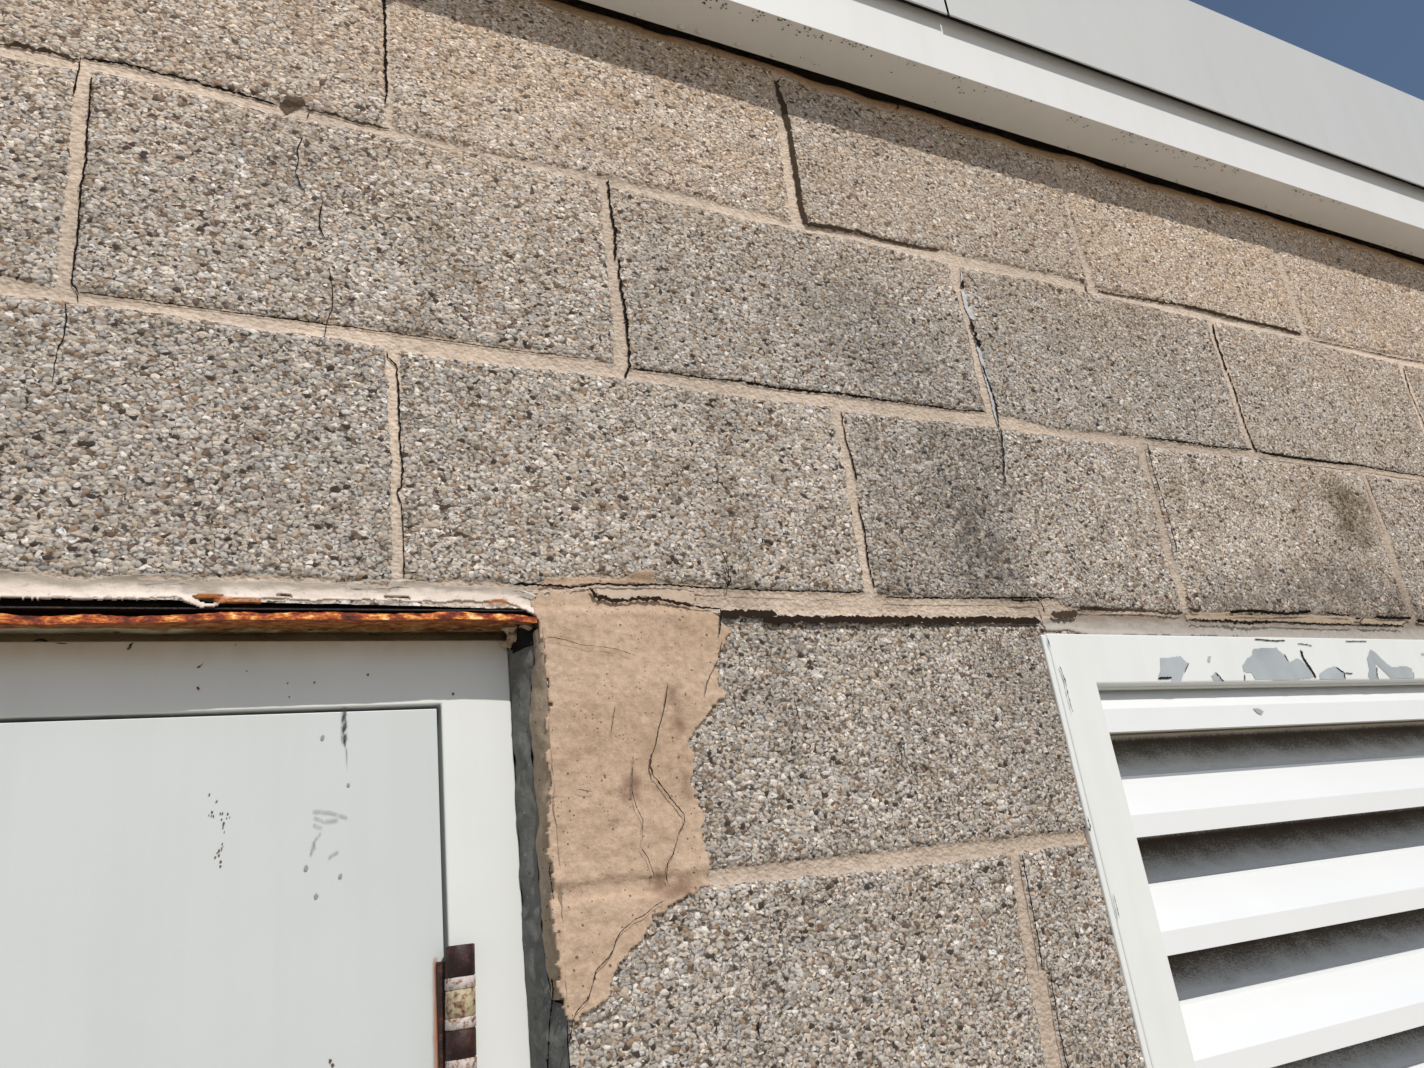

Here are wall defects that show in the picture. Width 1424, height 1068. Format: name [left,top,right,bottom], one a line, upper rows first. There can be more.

crack [774,79,939,251]
crack [514,180,1424,711]
corrosion [196,594,261,602]
peeling [595,586,695,605]
peeling [1158,656,1189,683]
peeling [1243,639,1424,680]
crack [546,686,685,1068]
crack [1022,855,1069,1068]